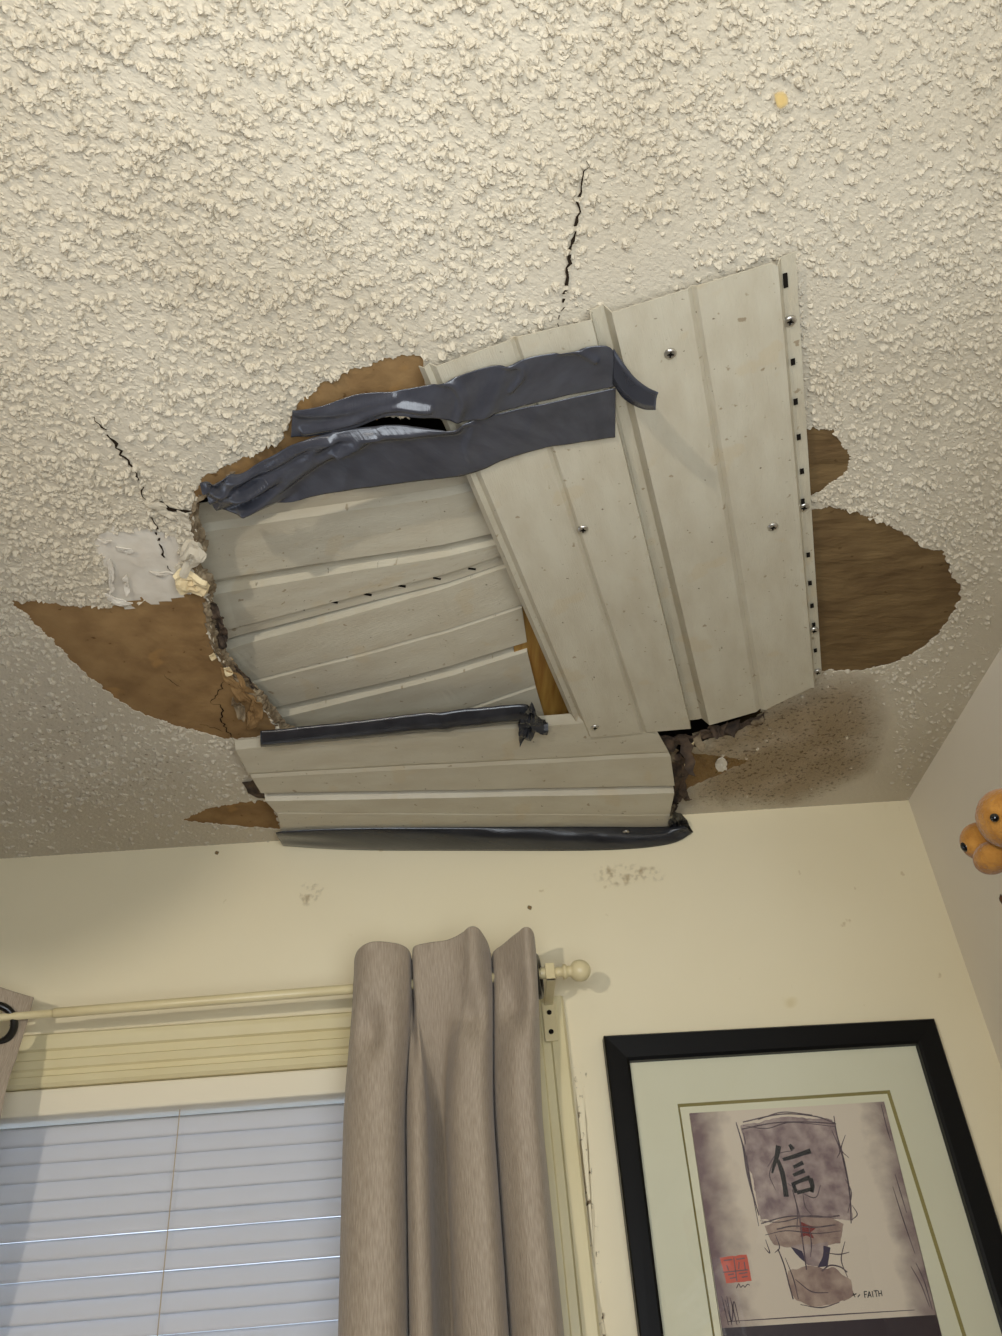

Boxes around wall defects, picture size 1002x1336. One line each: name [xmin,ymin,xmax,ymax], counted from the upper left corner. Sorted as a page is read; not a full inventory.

crack [557,161,590,327]
peeling [13,354,425,740]
peeling [807,427,961,673]
peeling [184,780,280,829]
peeling [685,752,748,789]